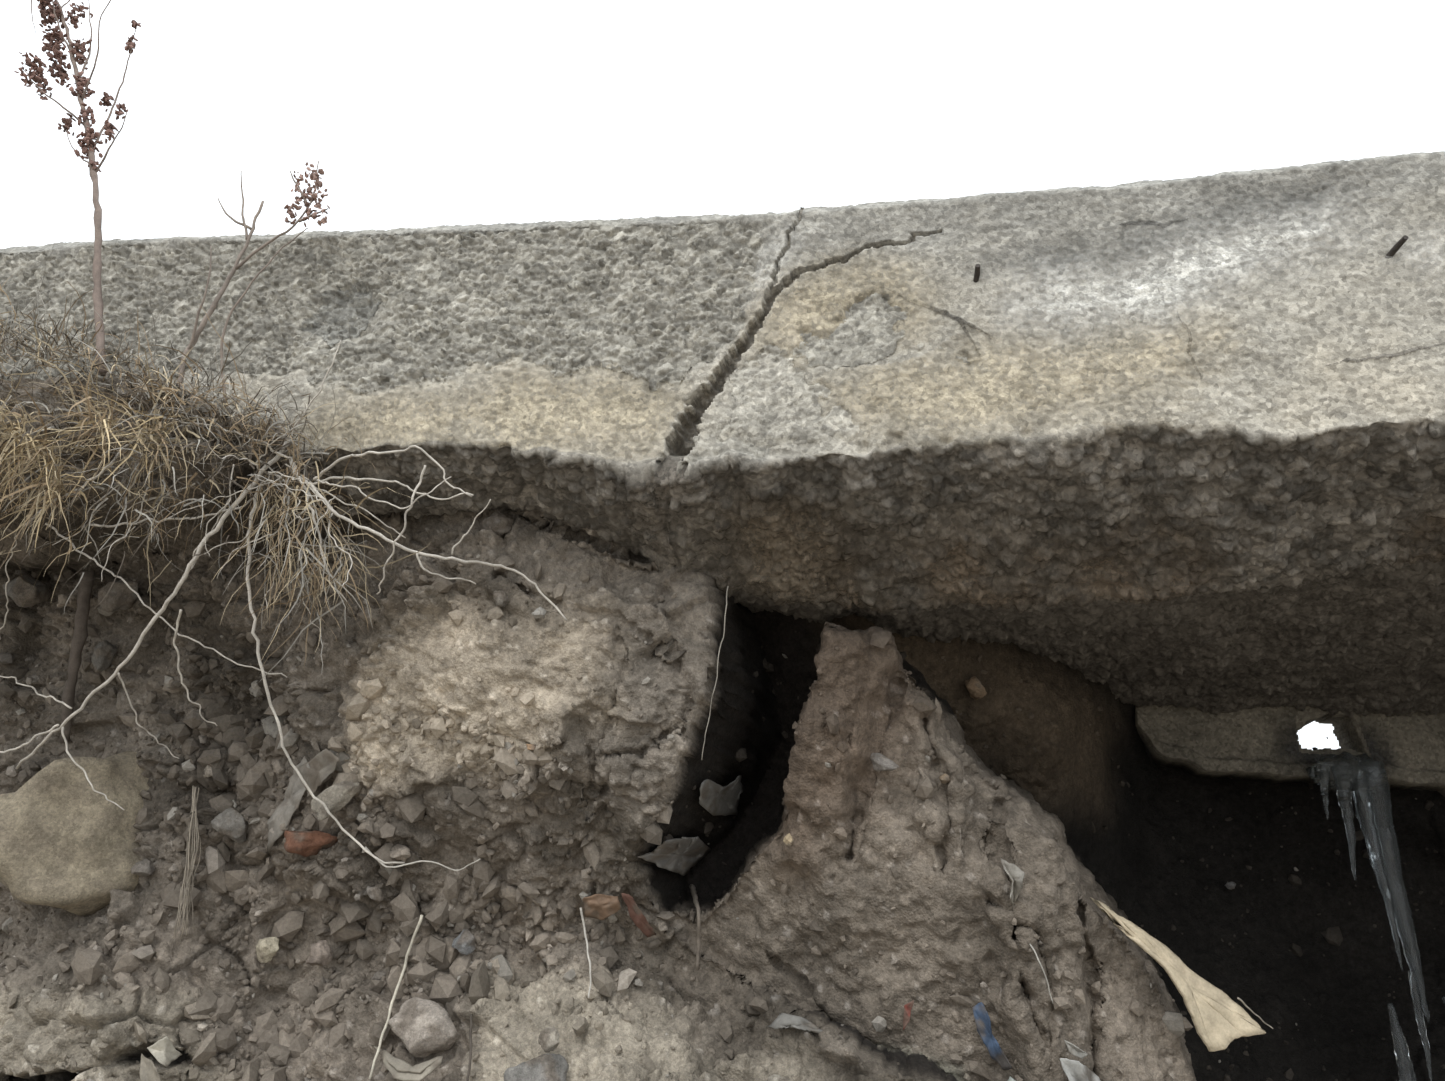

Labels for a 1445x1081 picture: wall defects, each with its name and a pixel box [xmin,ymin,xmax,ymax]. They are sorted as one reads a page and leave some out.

crack [658,207,932,464]
crack [888,289,993,360]